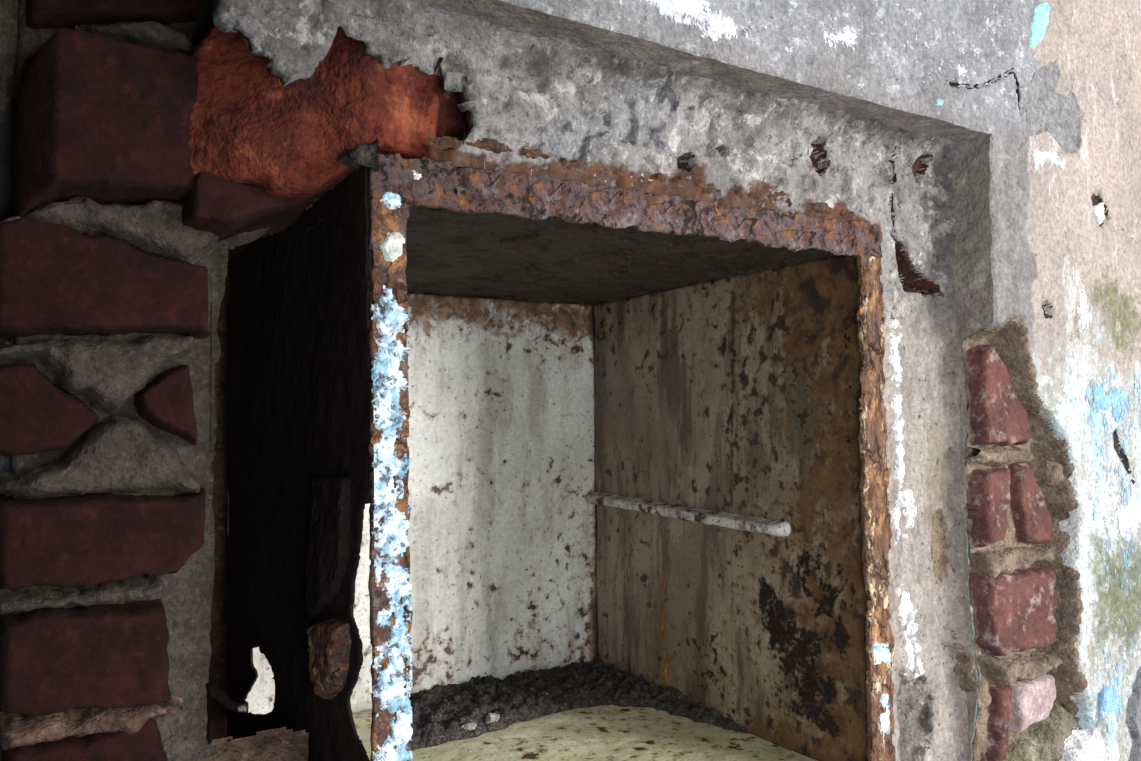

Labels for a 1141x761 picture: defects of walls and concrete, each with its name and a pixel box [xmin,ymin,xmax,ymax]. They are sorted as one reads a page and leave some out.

crack [946,68,1023,116]
corrosion [427,136,880,227]
spalling [407,291,509,300]
spalling [205,243,252,745]
spalling [931,508,951,585]
flaking render [952,315,1120,761]